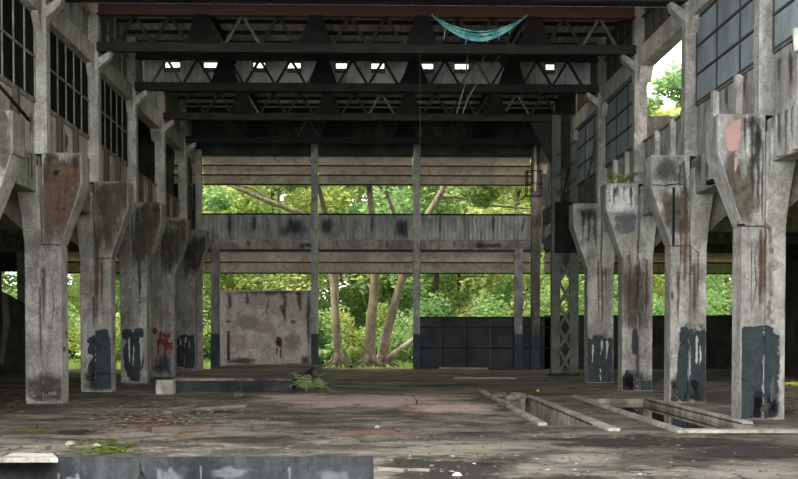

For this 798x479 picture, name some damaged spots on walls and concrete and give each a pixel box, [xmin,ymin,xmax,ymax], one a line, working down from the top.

peeling [725,119,741,172]
water stain [726,117,763,222]
water stain [581,210,597,246]
corrosion [751,226,766,303]
spalling [0,456,374,479]